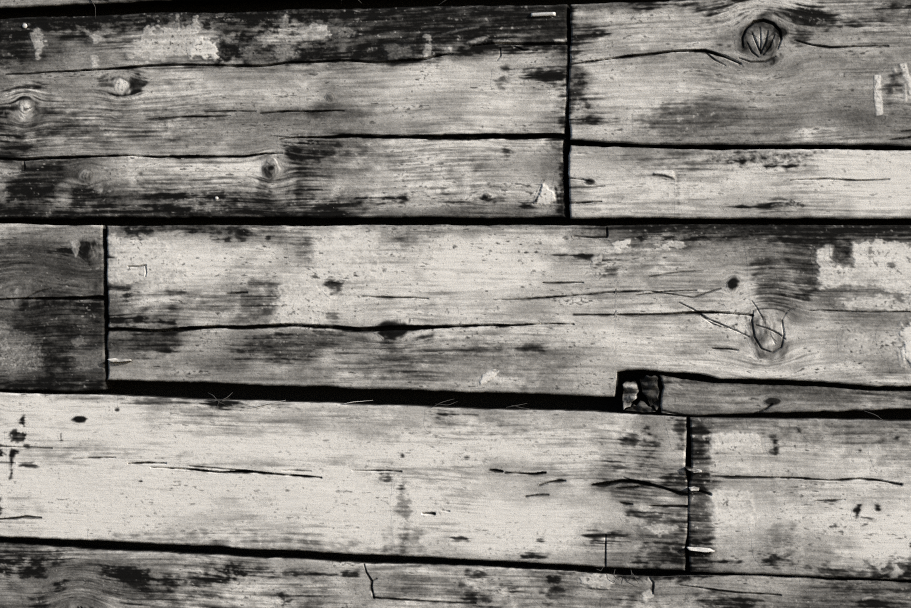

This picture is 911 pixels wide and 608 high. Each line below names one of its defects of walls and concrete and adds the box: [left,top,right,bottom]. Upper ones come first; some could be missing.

crack [583,23,783,67]
leakage [210,4,624,217]
leakage [575,147,911,319]
crack [178,324,222,332]
leakage [220,273,353,371]
leakage [371,317,440,361]
peeling [811,236,911,379]
leakage [424,407,554,462]
crack [30,446,323,479]
crack [489,468,567,499]
crack [590,479,688,509]
leakage [579,416,911,608]